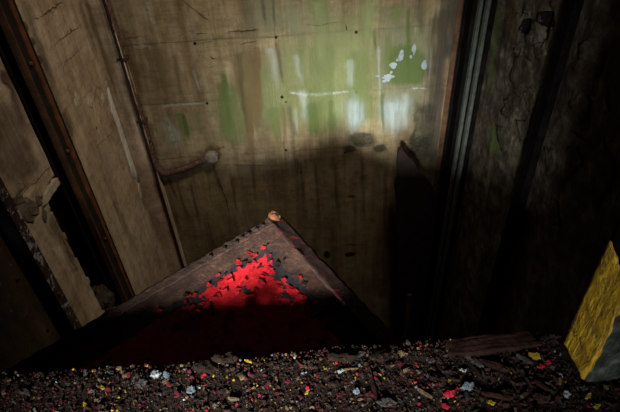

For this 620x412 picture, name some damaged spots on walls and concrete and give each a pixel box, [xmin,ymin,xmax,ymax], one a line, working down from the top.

peeling [375,43,416,83]
spalling [12,178,61,223]
peeling [206,244,285,306]